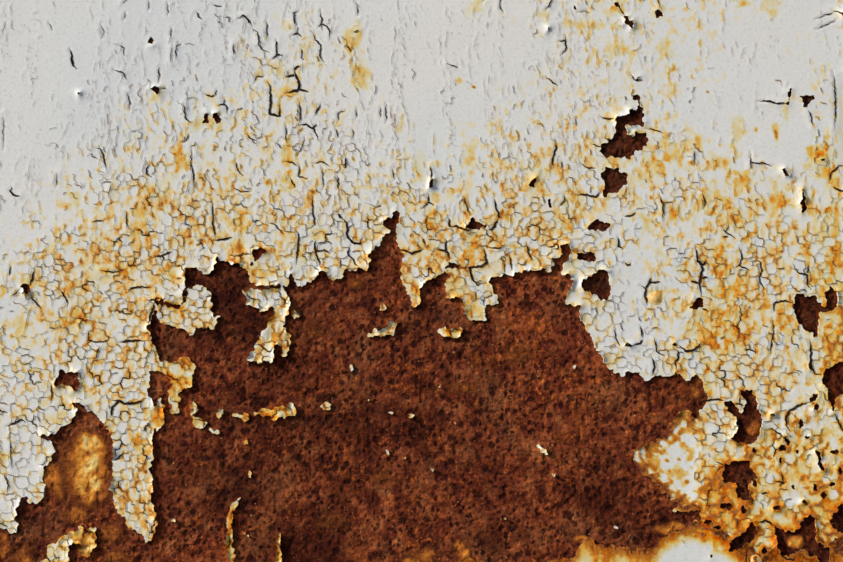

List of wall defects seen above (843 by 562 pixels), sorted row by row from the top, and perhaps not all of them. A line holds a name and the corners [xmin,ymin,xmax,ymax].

crack [740,79,786,116]
crack [821,78,836,129]
peeling [0,211,721,562]
corrosion [43,429,127,562]
corrosion [526,411,843,562]
corrosion [0,531,39,562]
corrosion [401,547,437,562]
corrosion [449,540,488,562]